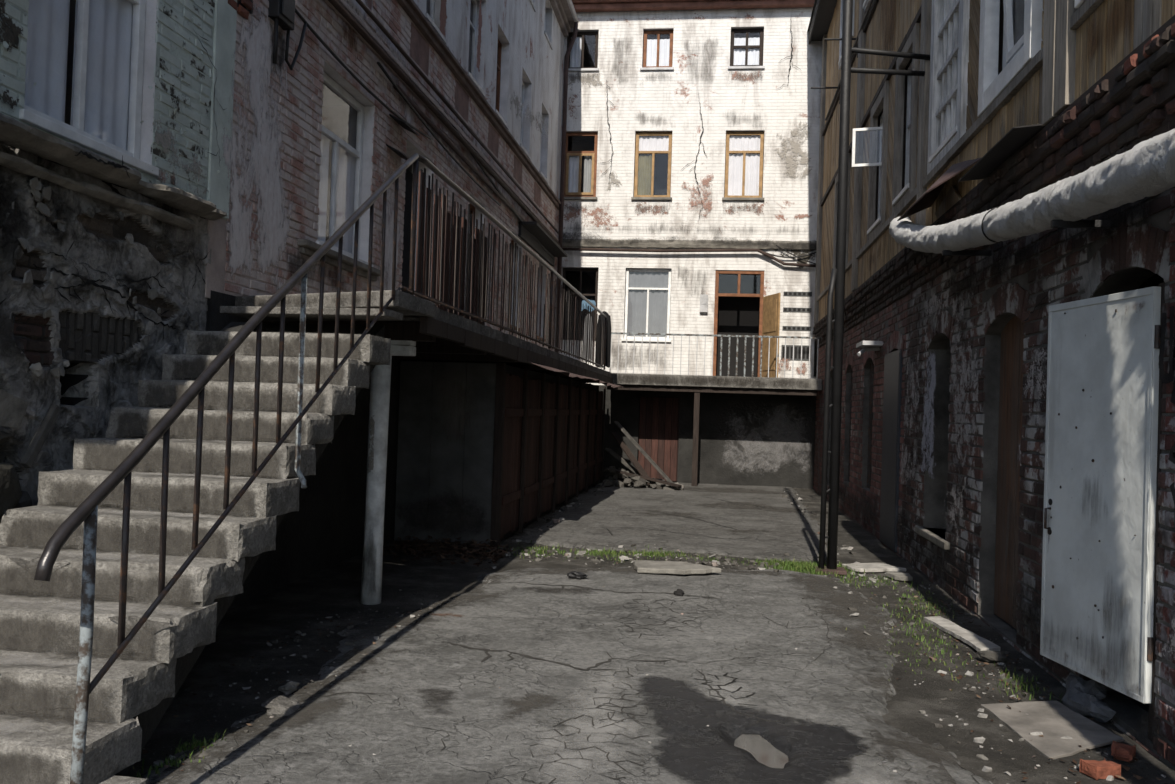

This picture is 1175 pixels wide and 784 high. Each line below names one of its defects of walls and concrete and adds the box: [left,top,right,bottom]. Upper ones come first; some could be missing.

peeling [0,0,24,51]
spalling [228,0,253,20]
crack [777,18,801,89]
peeling [0,76,19,109]
crack [681,93,707,217]
spalling [29,176,181,269]
spalling [563,202,652,244]
peeling [681,174,767,216]
spalling [694,238,816,268]
spalling [11,237,187,377]
crack [443,582,836,784]
leakage [639,677,961,784]